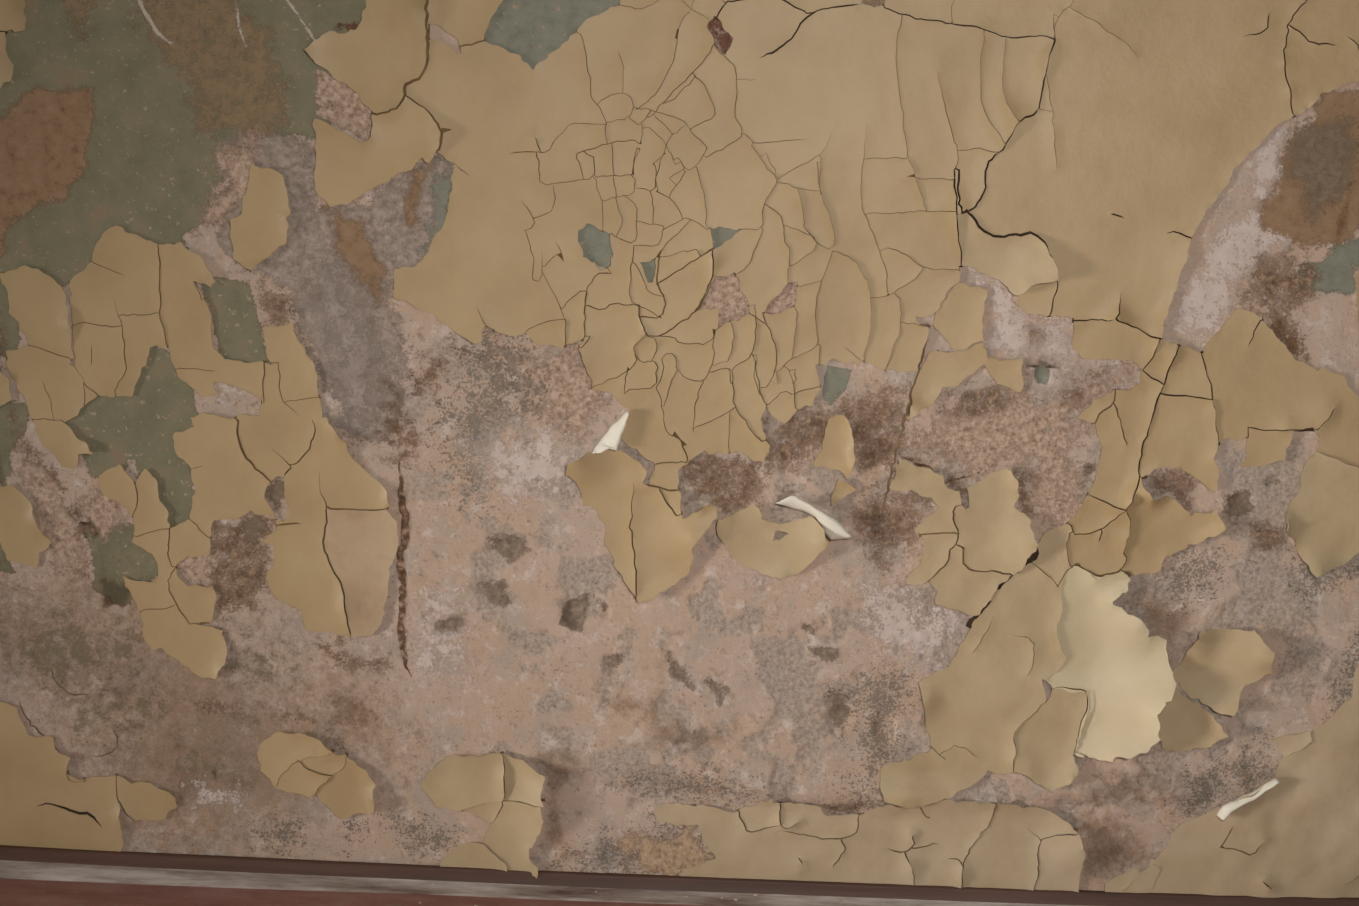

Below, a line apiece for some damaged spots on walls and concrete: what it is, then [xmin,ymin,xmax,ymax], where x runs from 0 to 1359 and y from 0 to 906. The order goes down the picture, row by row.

peeling [304,0,503,207]
crack [1243,0,1359,118]
crack [511,0,1334,527]
peeling [0,125,399,680]
crack [396,462,412,677]
peeling [479,341,857,607]
peeling [611,213,1274,892]
crack [966,548,1039,629]
crack [19,701,119,757]
crack [38,803,101,826]
peeling [0,702,178,852]
peeling [1104,664,1359,898]